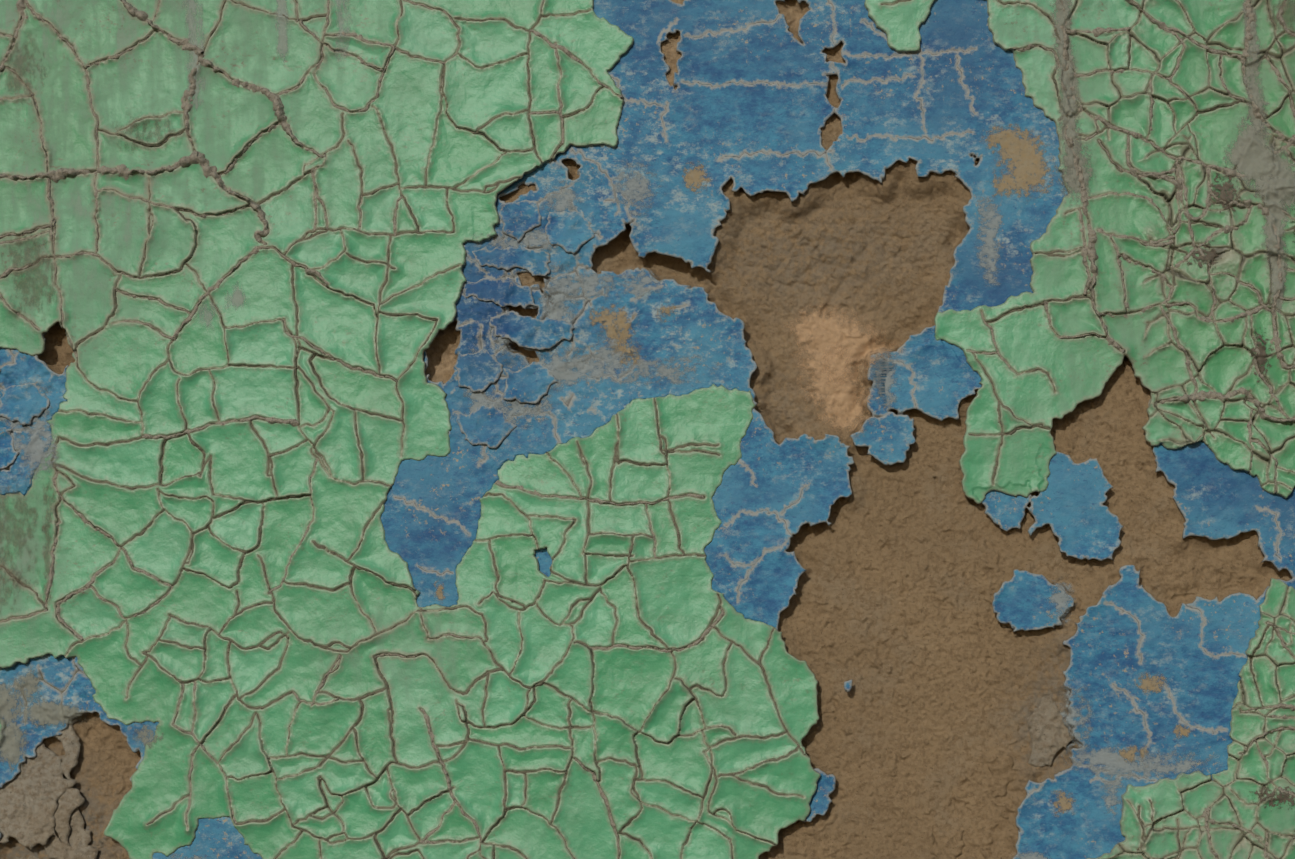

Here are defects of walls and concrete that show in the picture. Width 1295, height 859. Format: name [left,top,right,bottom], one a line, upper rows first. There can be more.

crack [0,0,805,859]
peeling [0,0,1174,743]
crack [785,0,924,140]
spalling [704,0,1295,859]
crack [967,0,1295,558]
peeling [0,623,821,859]
crack [1114,622,1295,859]